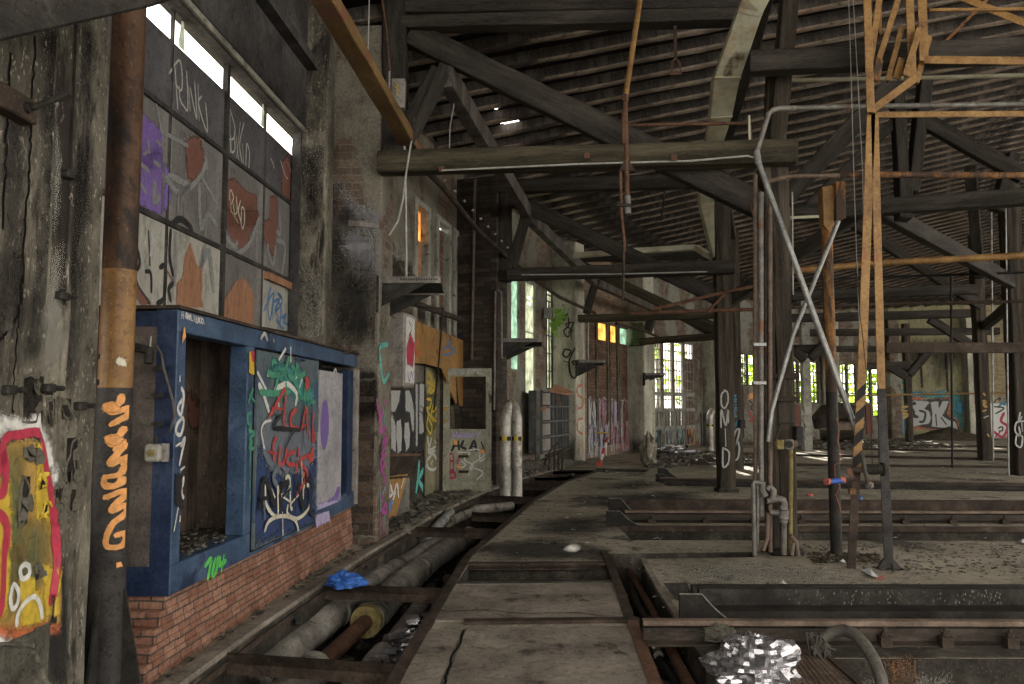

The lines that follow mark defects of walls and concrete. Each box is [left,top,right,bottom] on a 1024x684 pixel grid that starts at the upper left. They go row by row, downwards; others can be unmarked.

leakage [45,262,58,359]
crack [412,607,534,684]